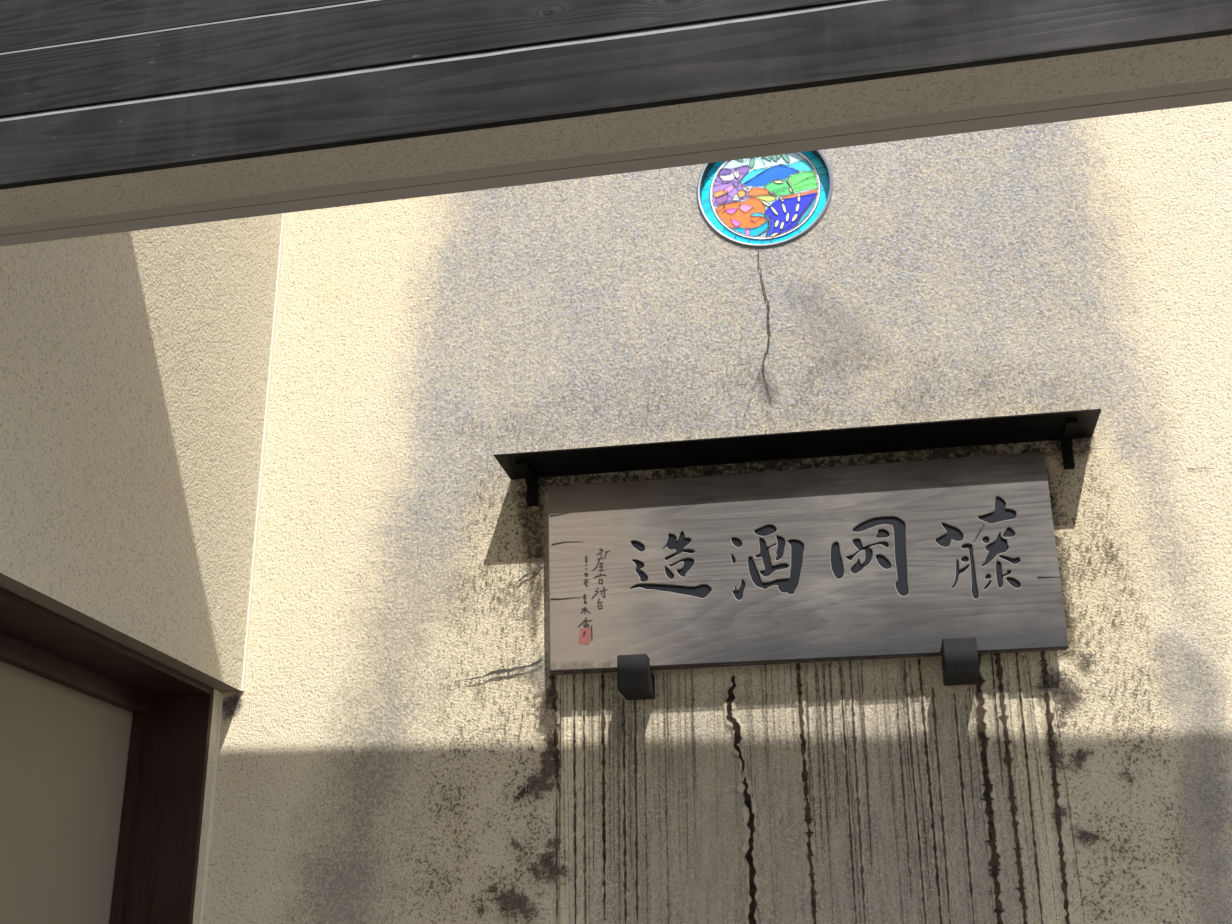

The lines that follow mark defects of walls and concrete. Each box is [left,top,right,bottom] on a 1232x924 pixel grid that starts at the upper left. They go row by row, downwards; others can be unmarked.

crack [758,248,772,402]
leakage [291,121,1205,924]
crack [455,658,543,682]
crack [724,676,759,924]